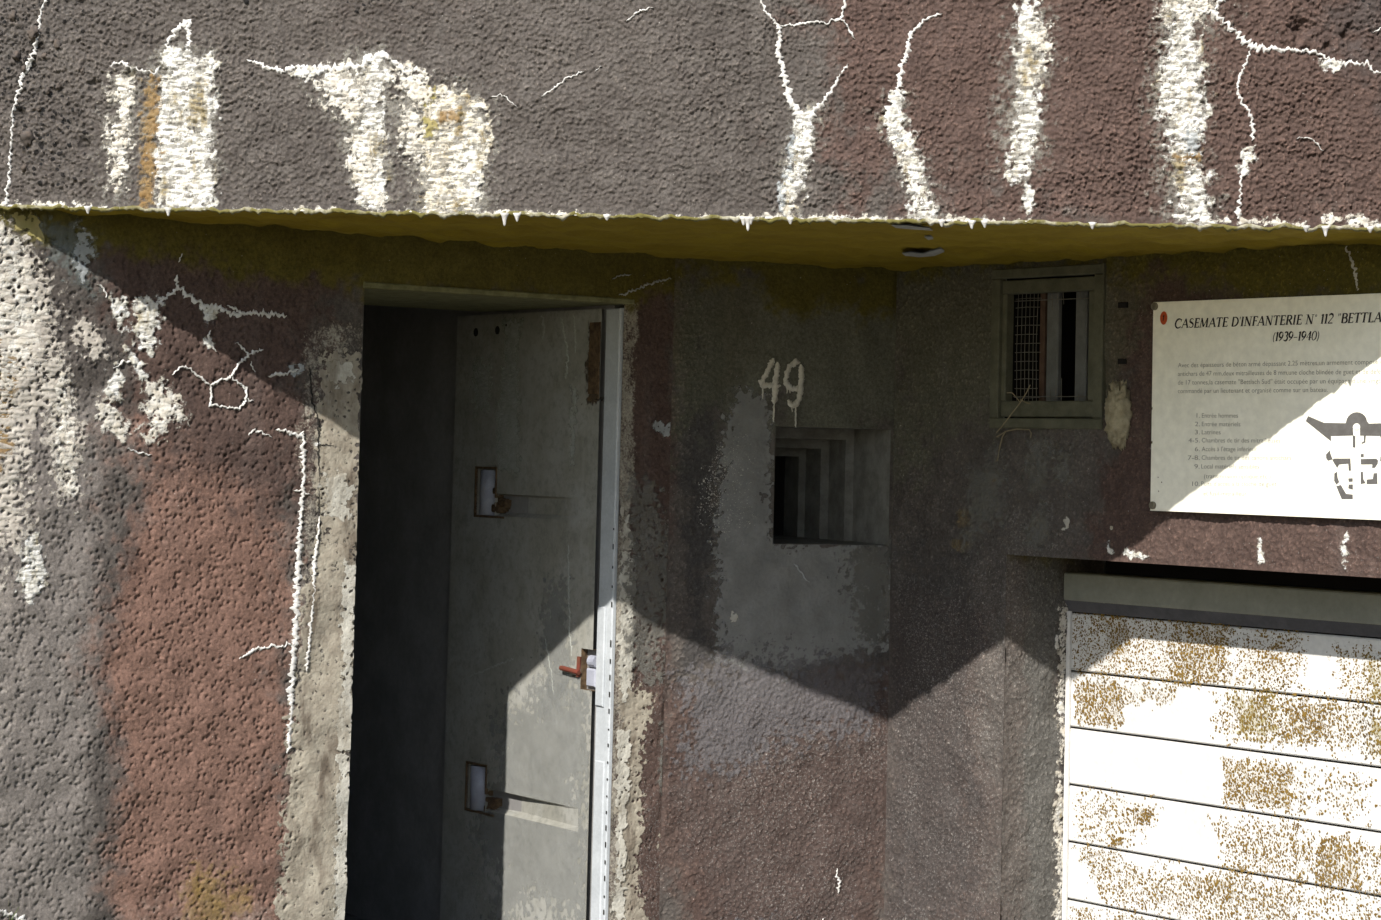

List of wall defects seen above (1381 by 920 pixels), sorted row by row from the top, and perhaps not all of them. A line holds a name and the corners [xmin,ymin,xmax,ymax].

crack [760,0,855,121]
crack [884,13,942,123]
crack [1196,0,1381,219]
leakage [0,0,1381,604]
crack [156,254,333,753]
peeling [273,346,363,920]
leakage [663,634,888,794]
rust [1068,613,1381,920]